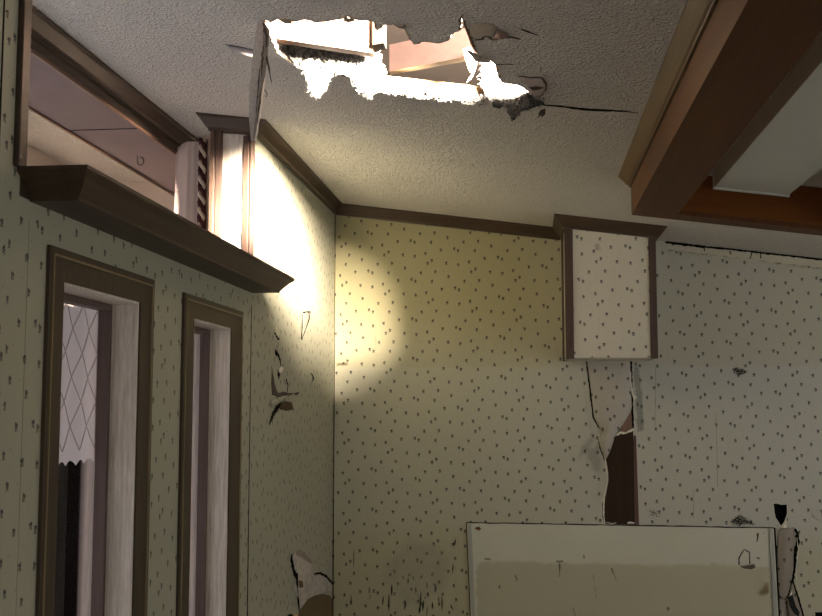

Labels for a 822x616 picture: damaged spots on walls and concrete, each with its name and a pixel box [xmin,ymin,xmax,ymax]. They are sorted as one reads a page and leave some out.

peeling [463,22,521,74]
peeling [518,76,547,97]
crack [544,105,638,114]
spalling [774,503,787,525]